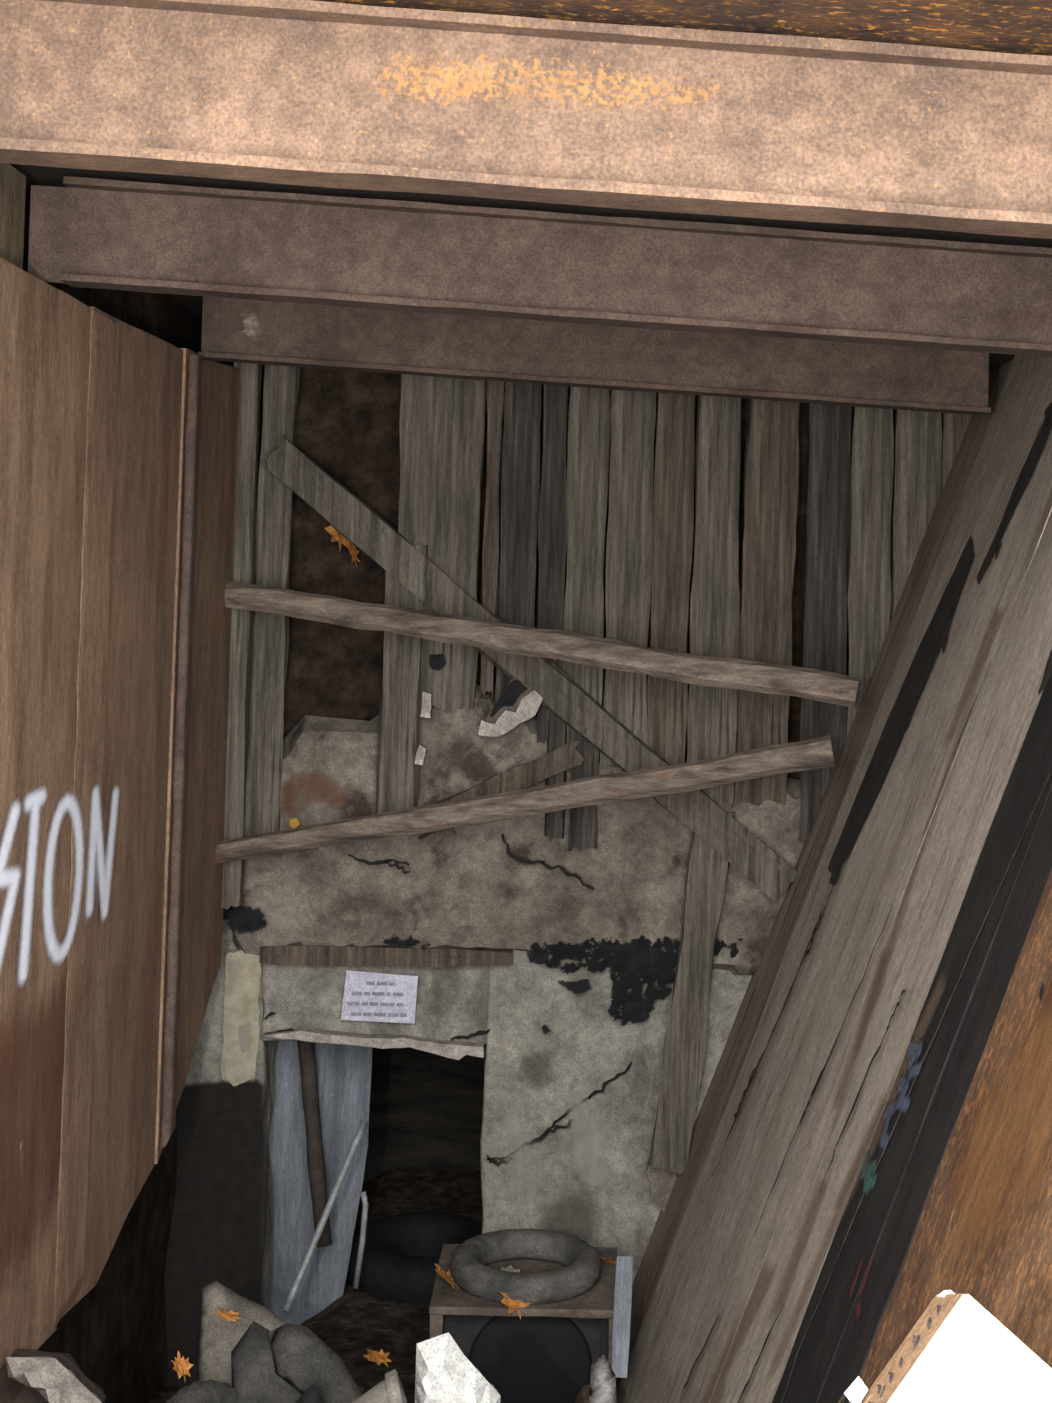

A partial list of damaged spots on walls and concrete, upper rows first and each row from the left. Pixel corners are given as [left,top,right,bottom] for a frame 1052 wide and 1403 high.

crack [501,834,594,890]
peeling [526,935,680,1026]
peeling [714,938,742,958]
crack [486,1061,632,1166]